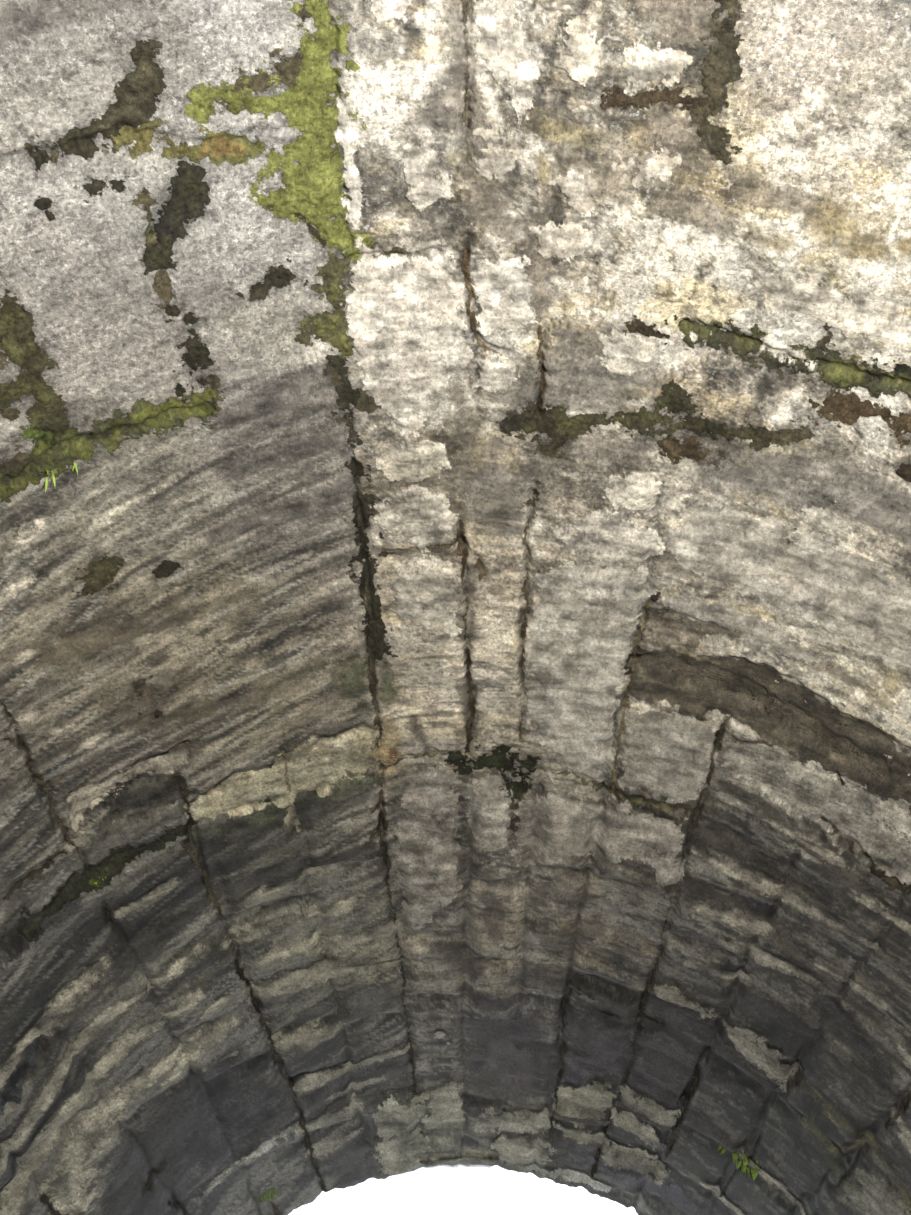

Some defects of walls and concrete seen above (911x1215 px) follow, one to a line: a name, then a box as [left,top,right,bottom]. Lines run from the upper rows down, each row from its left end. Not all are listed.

crack [461,0,474,164]
water stain [415,0,587,320]
water stain [650,105,715,174]
crack [459,236,502,356]
water stain [80,482,168,541]
spalling [66,724,380,837]
crack [177,776,328,1191]
water stain [206,327,657,557]
crack [518,505,535,739]
crack [536,600,732,1177]
flaking render [392,469,911,932]
water stain [655,406,911,543]